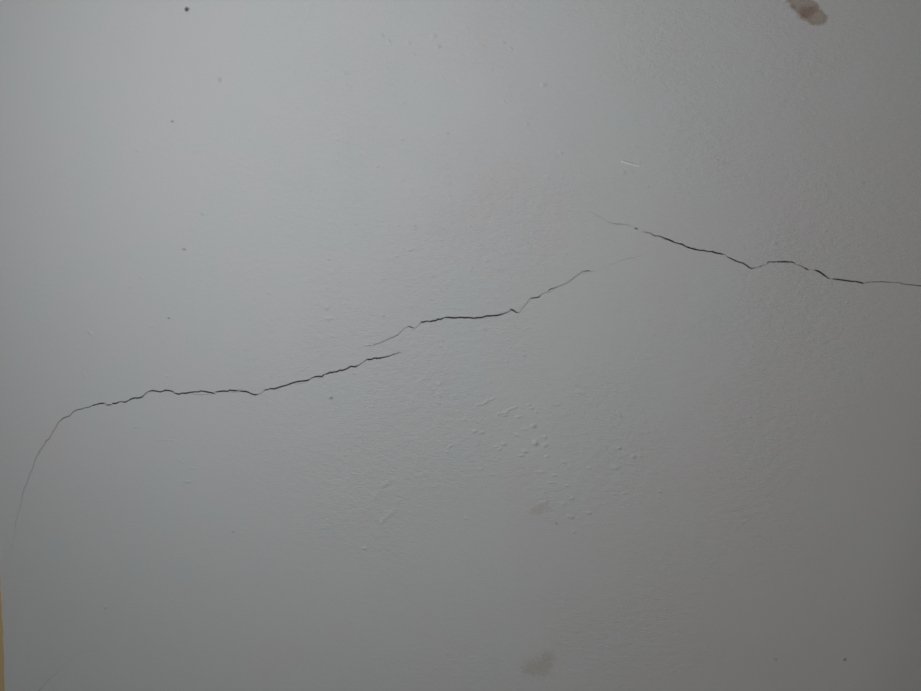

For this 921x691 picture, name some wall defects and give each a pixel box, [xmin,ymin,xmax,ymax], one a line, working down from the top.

crack [635,228,752,269]
crack [777,261,864,284]
crack [408,288,554,331]
crack [64,355,391,418]